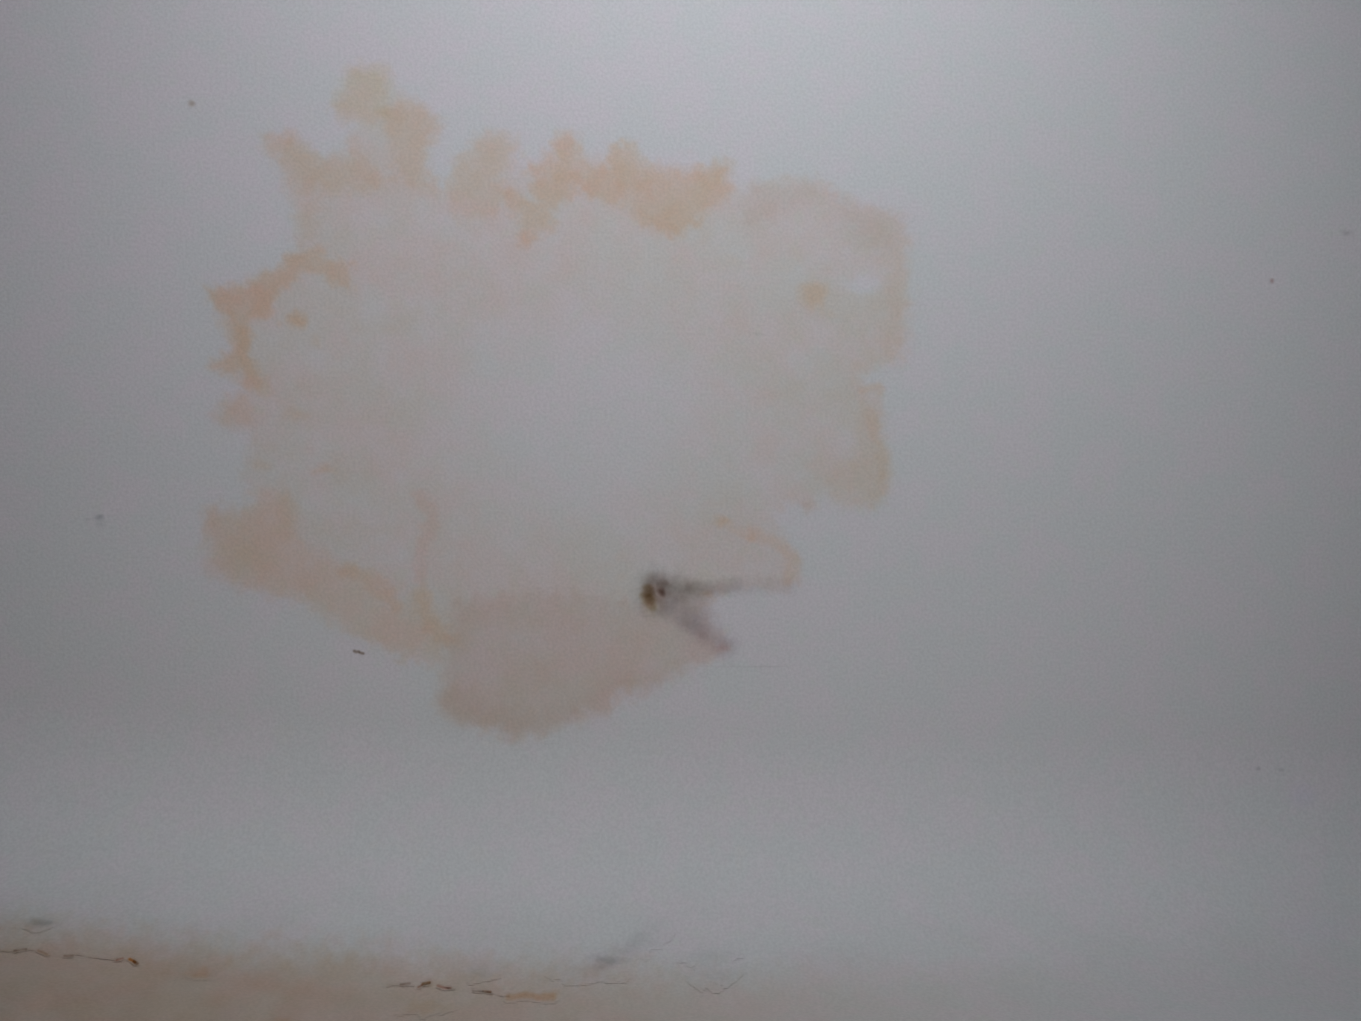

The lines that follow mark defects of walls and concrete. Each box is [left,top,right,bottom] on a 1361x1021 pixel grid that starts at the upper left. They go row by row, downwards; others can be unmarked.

water stain [188,51,924,752]